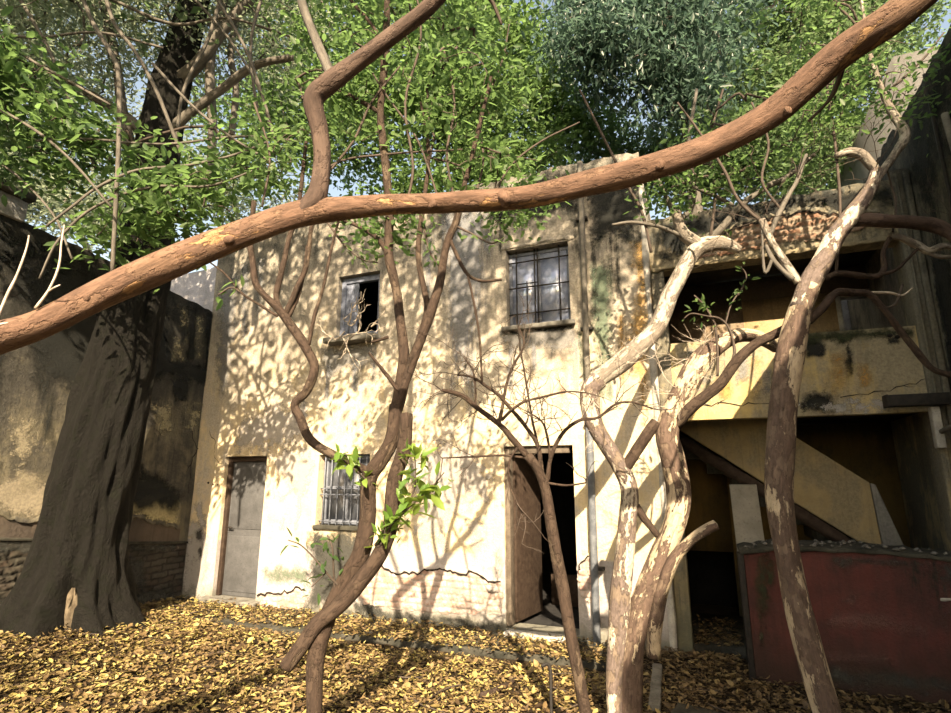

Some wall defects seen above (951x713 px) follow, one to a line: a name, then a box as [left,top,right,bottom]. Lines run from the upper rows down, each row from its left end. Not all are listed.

water stain [529,186,642,316]
water stain [443,211,516,427]
water stain [497,325,583,390]
water stain [798,392,886,414]
water stain [806,327,913,374]
crack [840,379,924,398]
spalling [0,420,46,542]
spalling [129,501,180,541]
spalling [359,440,504,616]
spalling [257,582,305,609]